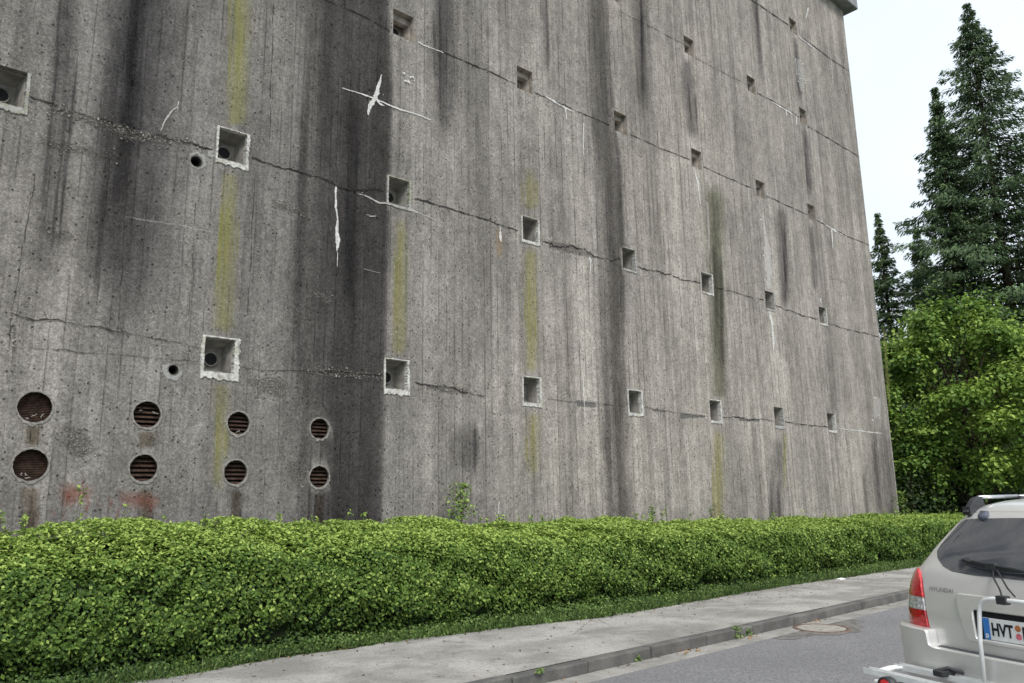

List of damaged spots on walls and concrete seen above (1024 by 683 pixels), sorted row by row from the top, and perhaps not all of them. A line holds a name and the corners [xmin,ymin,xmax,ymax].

damp [343,74,431,120]
crack [244,3,385,315]
crack [443,52,868,245]
crack [9,90,212,362]
crack [414,197,518,231]
crack [542,241,883,338]
crack [416,382,483,398]